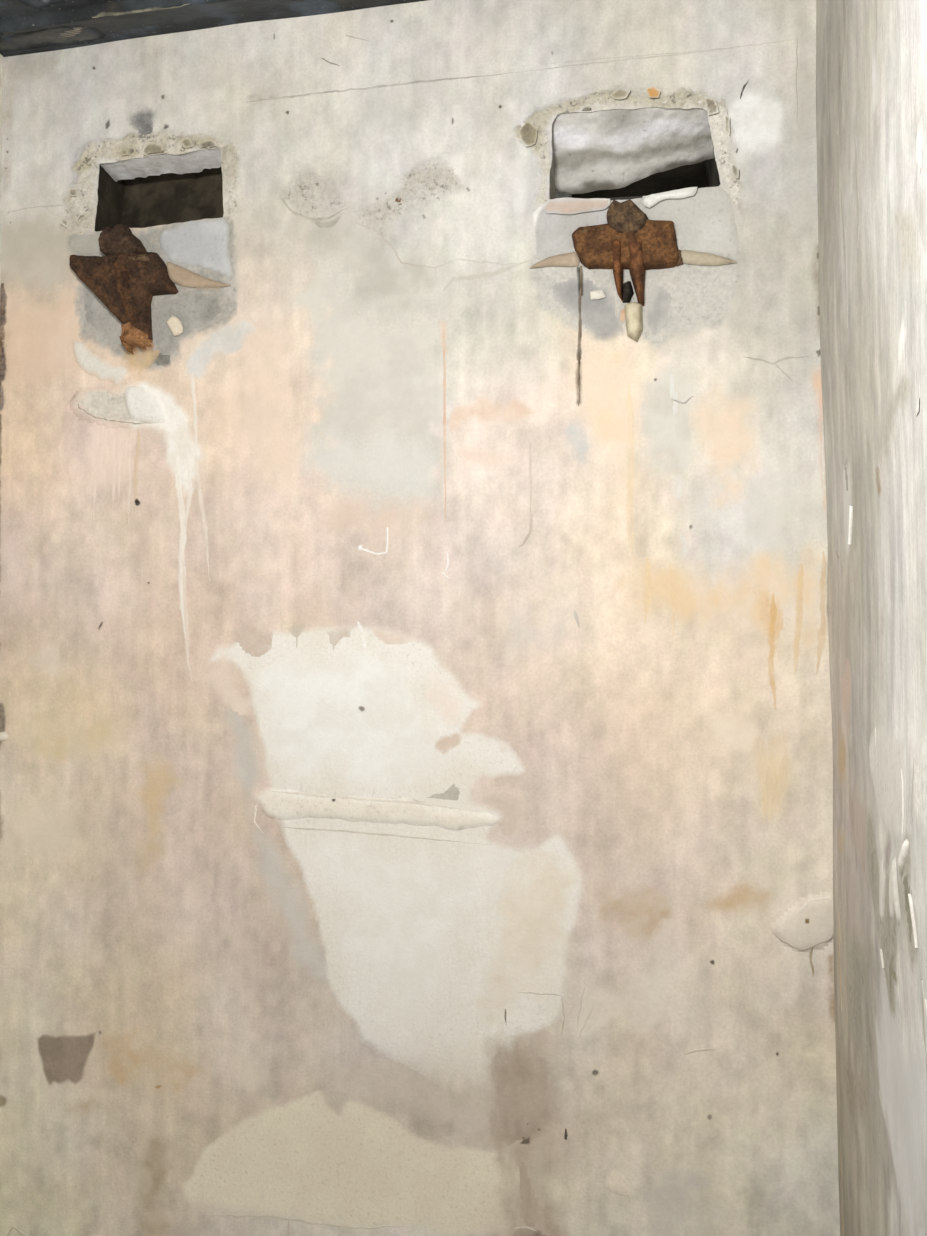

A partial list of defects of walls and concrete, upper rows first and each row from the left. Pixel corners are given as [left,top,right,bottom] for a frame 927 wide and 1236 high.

spalling [59,126,256,429]
spalling [511,84,751,356]
water stain [640,0,829,639]
efflorescence [82,373,211,682]
peeling [227,619,598,1100]
peeling [36,1030,106,1123]
peeling [180,1089,497,1236]